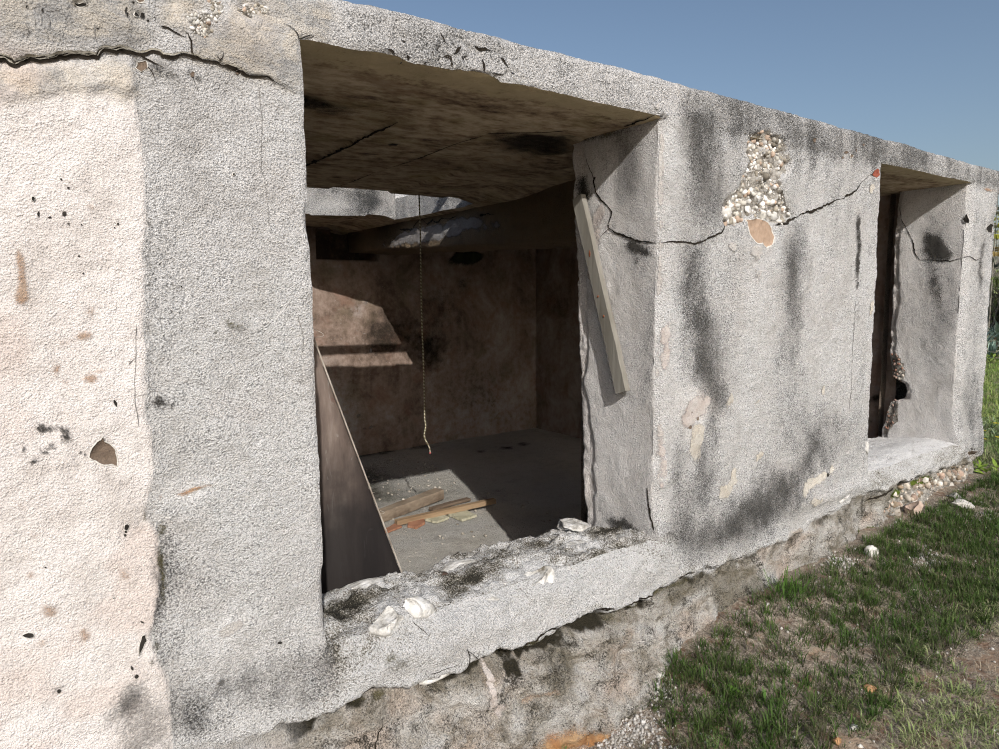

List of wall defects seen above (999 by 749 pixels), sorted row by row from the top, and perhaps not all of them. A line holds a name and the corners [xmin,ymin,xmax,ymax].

spalling [185,0,224,38]
spalling [237,2,270,18]
crack [0,1,297,114]
crack [306,122,398,166]
leakage [500,134,568,156]
crack [586,160,730,245]
spalling [721,129,791,248]
crack [899,208,980,262]
leakage [923,232,954,302]
spalling [891,352,905,382]
flaking render [681,395,711,462]
spalling [884,398,904,435]